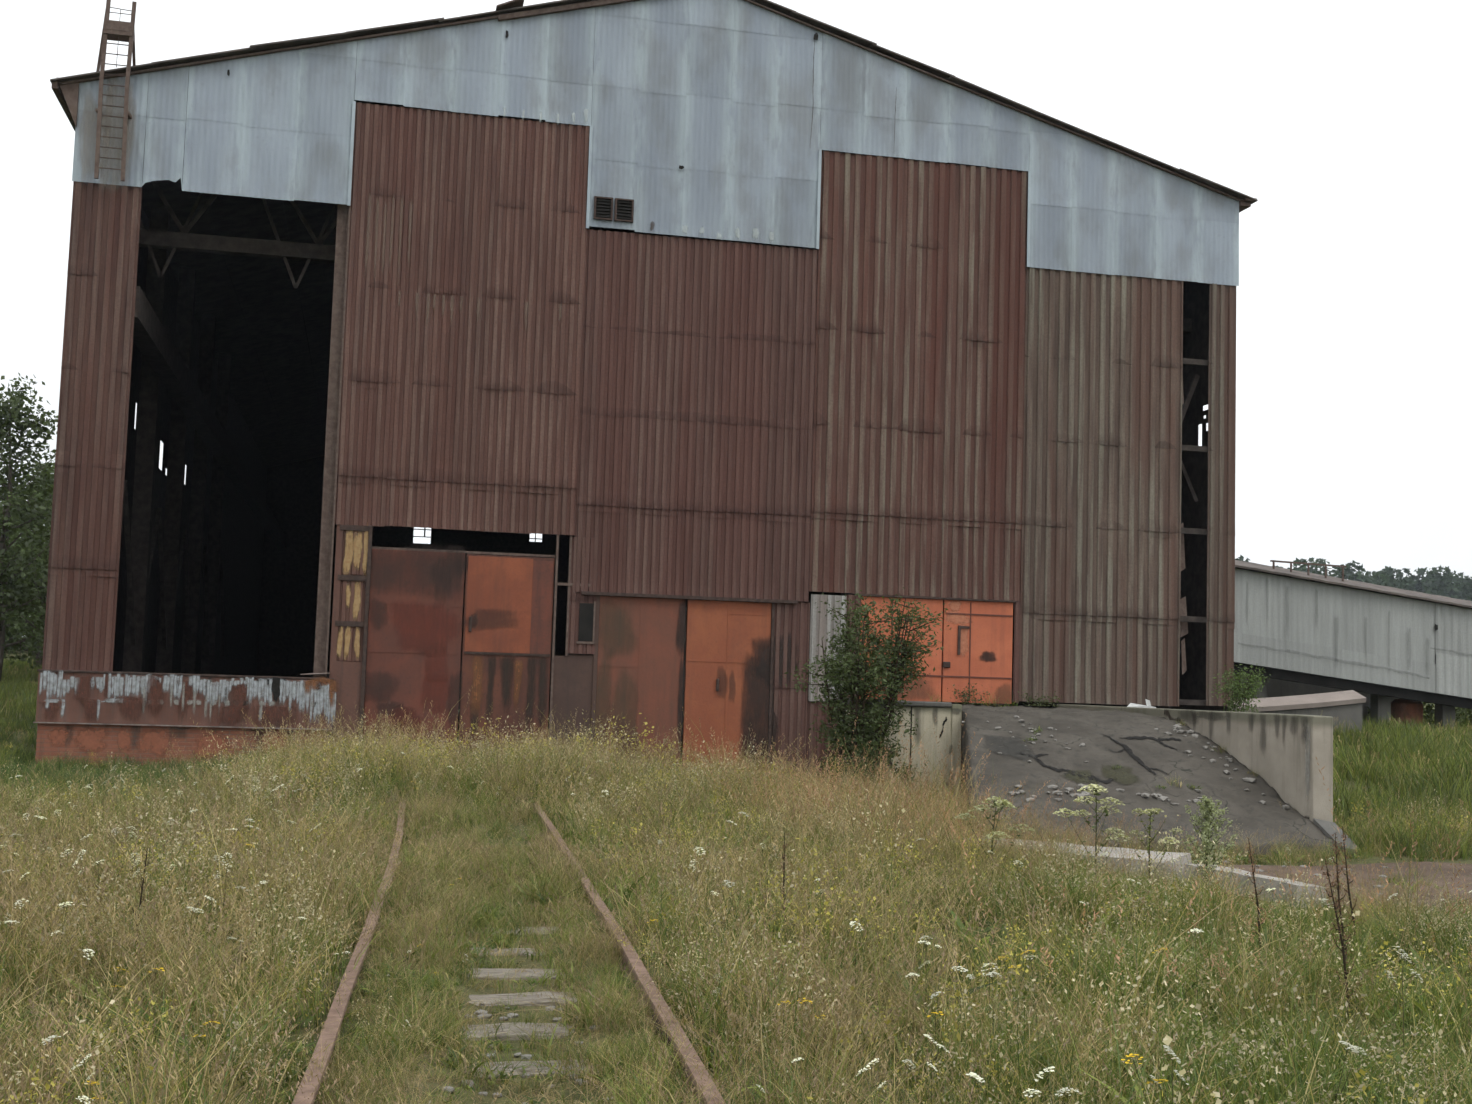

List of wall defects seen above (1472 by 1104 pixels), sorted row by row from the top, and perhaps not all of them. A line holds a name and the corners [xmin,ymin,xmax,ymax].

rust [980,651,996,662]
rust [76,676,192,719]
peeling [39,671,336,755]
rust [217,684,294,725]
rust [305,678,337,705]
crack [1019,735,1182,784]